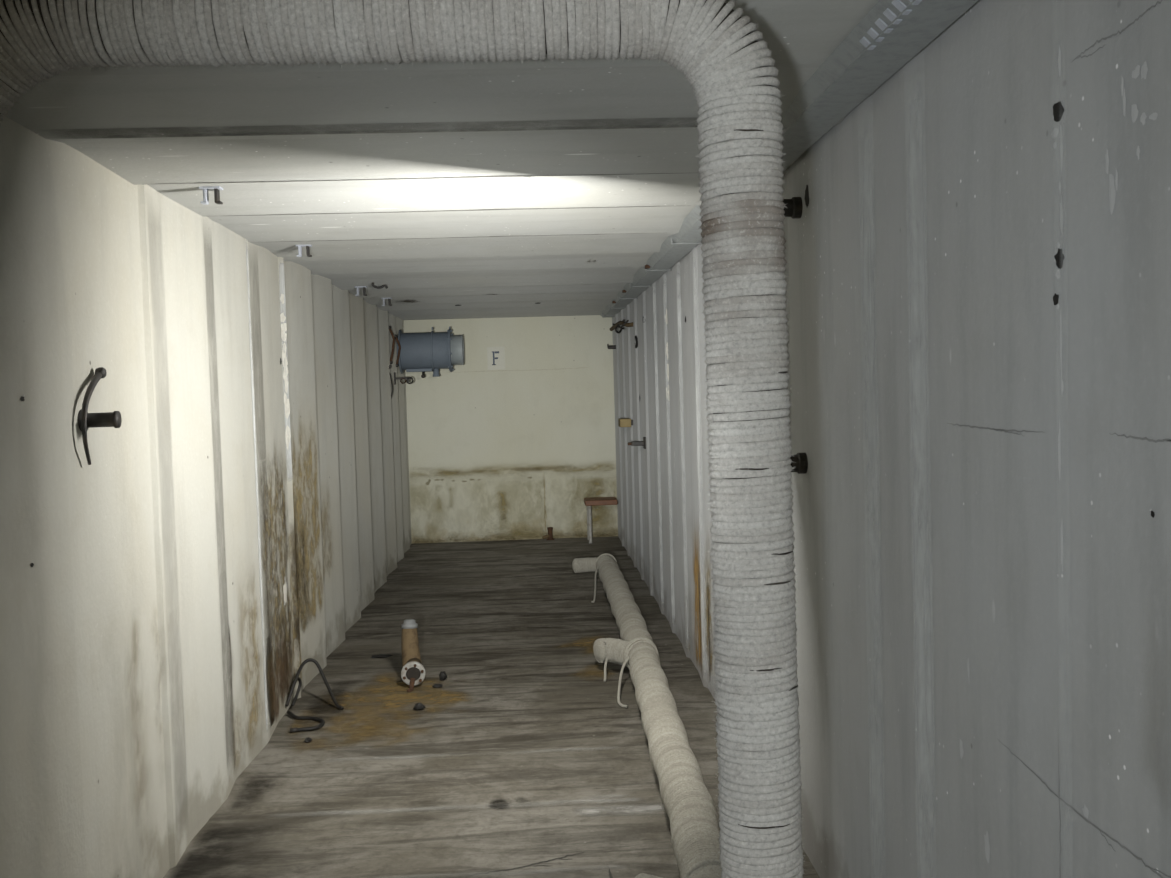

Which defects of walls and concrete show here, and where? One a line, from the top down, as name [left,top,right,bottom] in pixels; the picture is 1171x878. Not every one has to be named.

crack [1072,0,1162,62]
crack [947,423,1044,436]
crack [1109,433,1171,443]
crack [1004,744,1171,878]